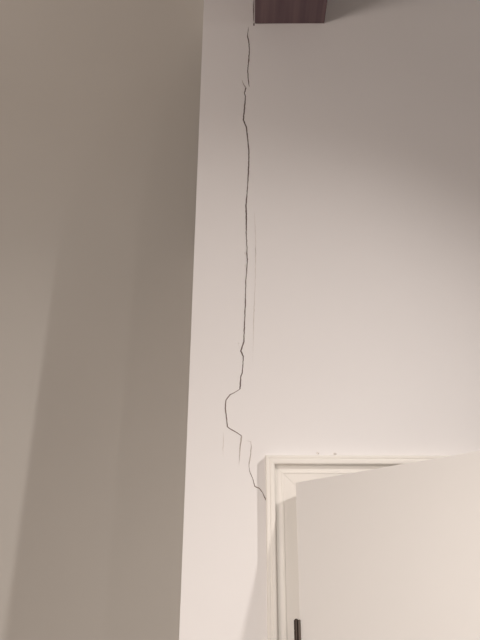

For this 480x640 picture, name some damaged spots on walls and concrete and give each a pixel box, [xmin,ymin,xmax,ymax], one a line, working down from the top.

crack [223,28,266,500]